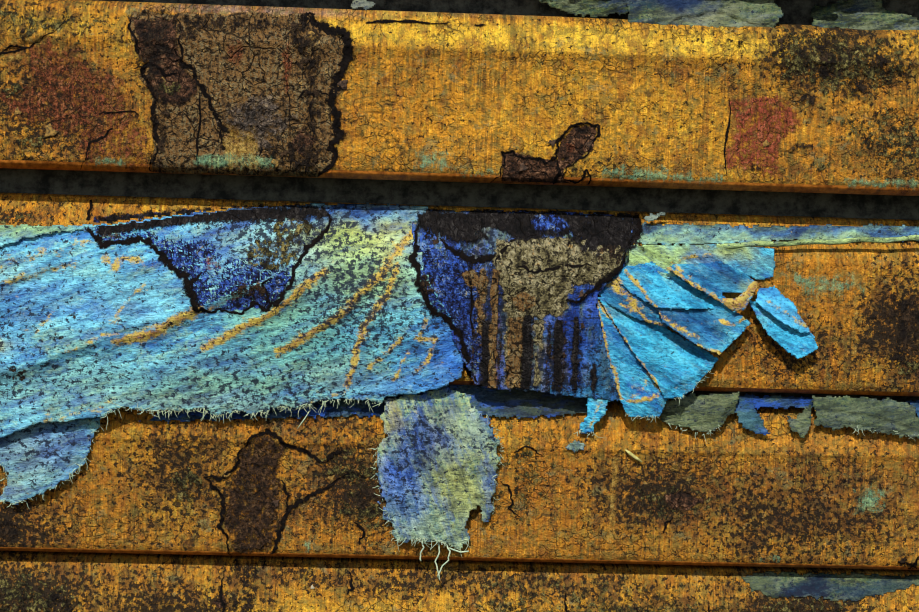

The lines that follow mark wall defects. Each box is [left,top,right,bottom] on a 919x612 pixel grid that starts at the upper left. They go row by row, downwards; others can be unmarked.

crack [0,16,67,58]
peeling [127,7,356,177]
peeling [490,122,601,185]
corrosion [723,95,800,177]
corrosion [791,143,830,172]
peeling [85,199,332,315]
peeling [408,222,496,383]
peeling [172,427,366,569]